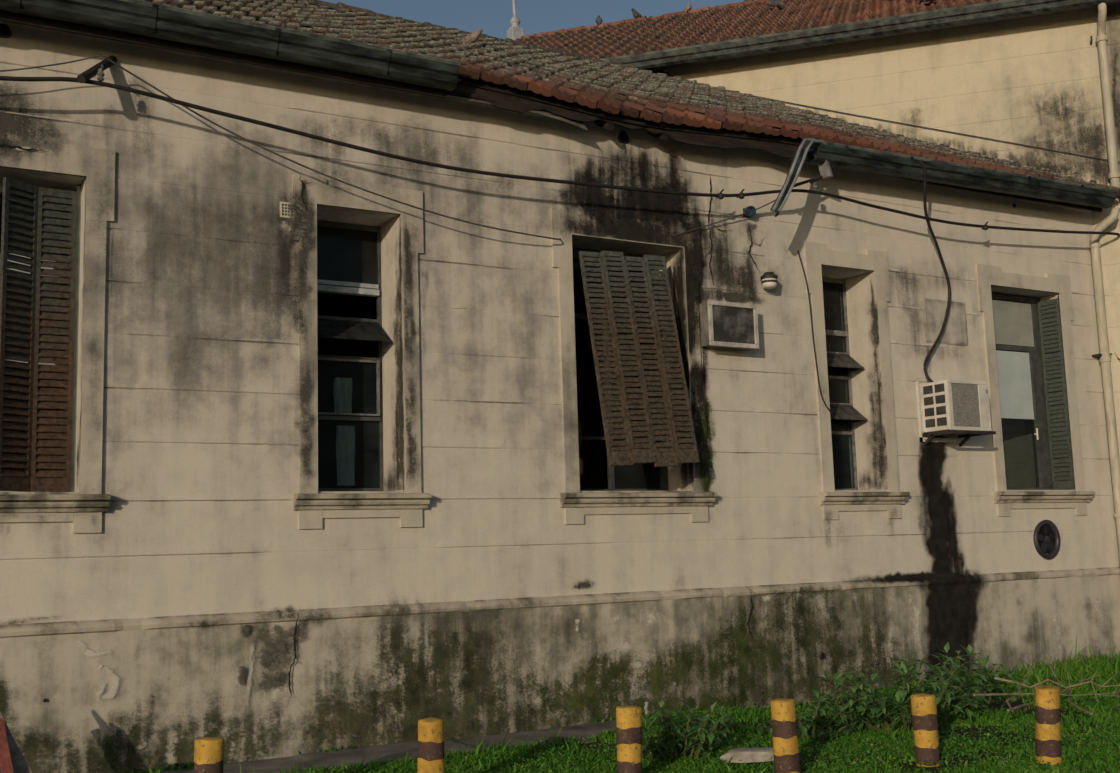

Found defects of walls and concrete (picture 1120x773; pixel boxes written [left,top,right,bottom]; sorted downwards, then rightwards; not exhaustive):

water stain [0,85,56,160]
water stain [868,433,985,680]
crack [288,613,302,695]
water stain [269,608,329,639]